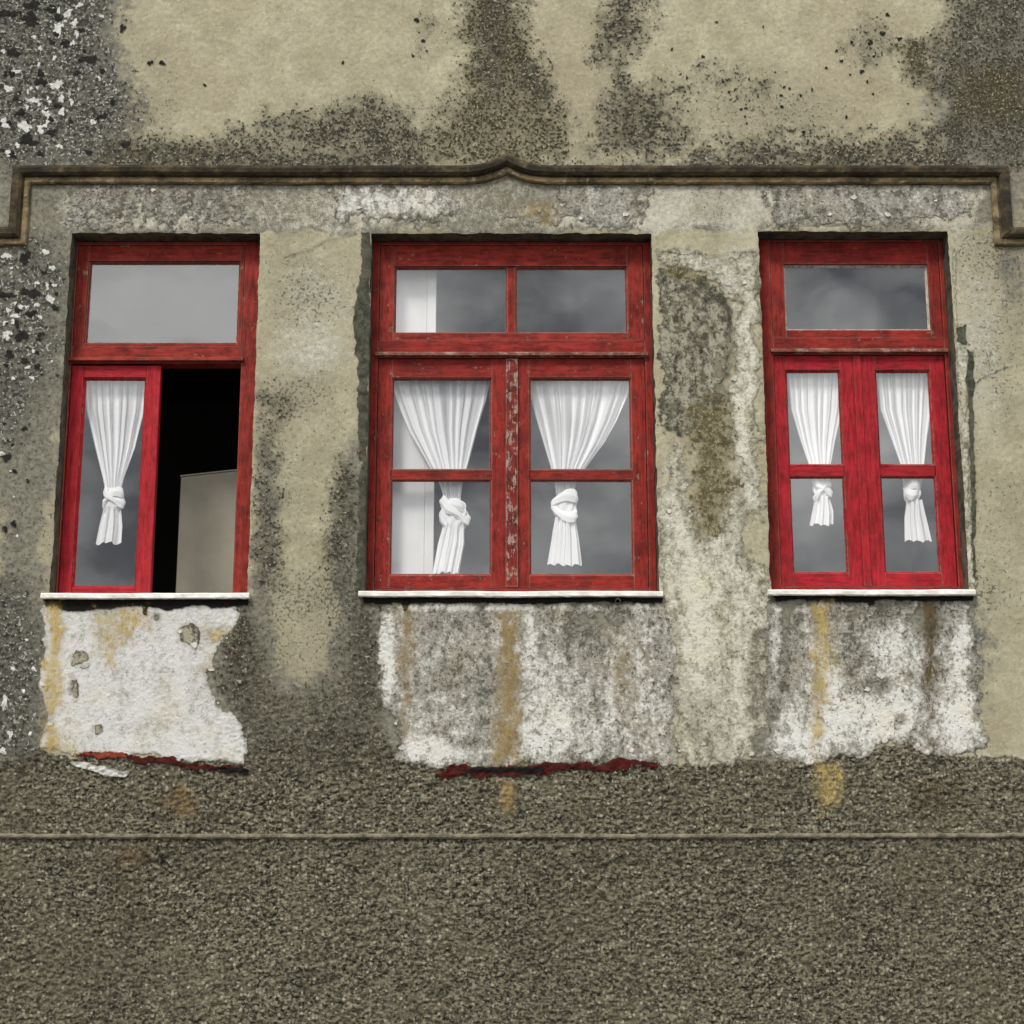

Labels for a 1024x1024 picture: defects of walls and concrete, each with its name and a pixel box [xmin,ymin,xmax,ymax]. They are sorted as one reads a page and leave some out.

mould [0,0,1024,247]
peeling [373,244,990,770]
peeling [38,605,248,778]
rust [493,613,522,761]
rust [807,600,836,739]
rust [499,781,516,809]
rust [818,762,843,803]